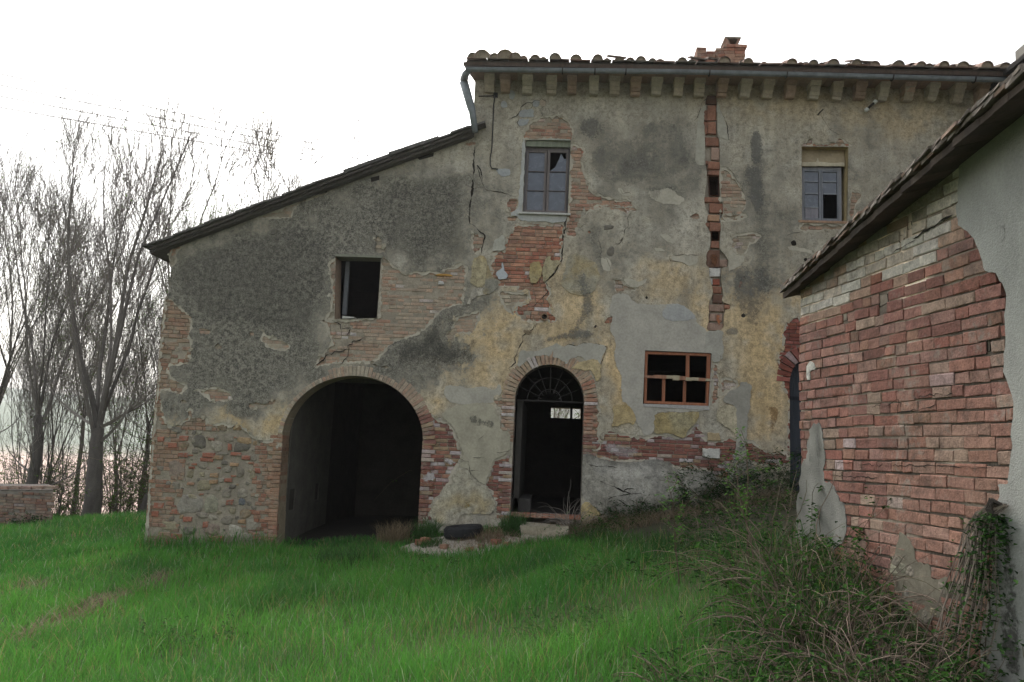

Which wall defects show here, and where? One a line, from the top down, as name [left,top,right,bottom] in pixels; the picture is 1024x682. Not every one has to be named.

crack [465,148,515,254]
spalling [469,115,638,325]
water stain [745,131,765,213]
spalling [250,329,290,351]
crack [310,321,364,371]
spalling [314,237,481,369]
spalling [143,296,281,547]
spalling [415,408,465,520]
spalling [494,167,1013,670]